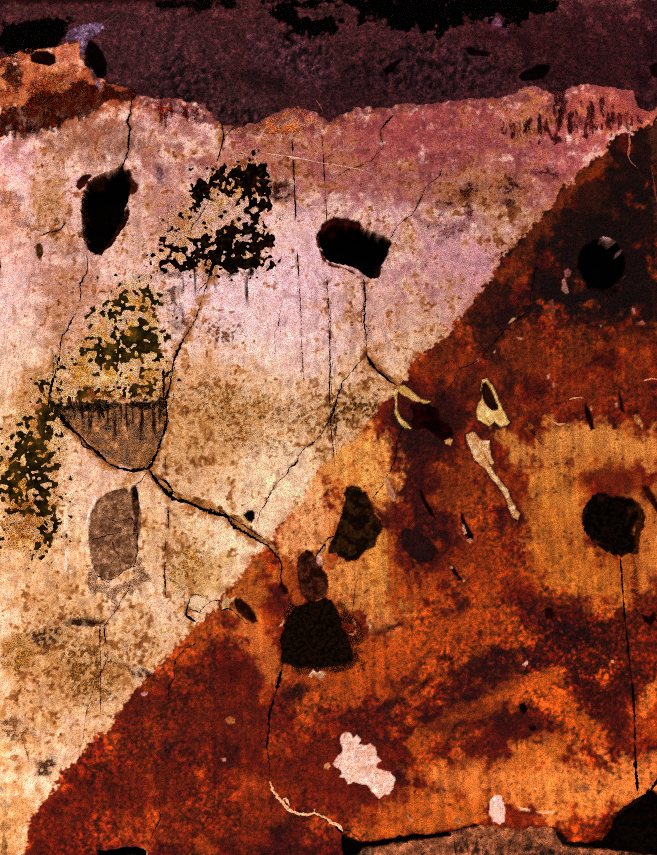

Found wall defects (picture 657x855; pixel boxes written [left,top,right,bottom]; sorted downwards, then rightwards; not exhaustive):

corrosion [0,54,137,139]
corrosion [265,108,324,134]
peeling [0,150,283,583]
leakage [53,398,168,468]
crack [48,252,397,596]
corrosion [6,499,47,540]
crack [185,594,247,624]
spalling [279,486,384,680]
crack [620,558,657,791]
crack [266,669,360,850]
peeling [324,732,396,799]
spalling [572,789,657,855]